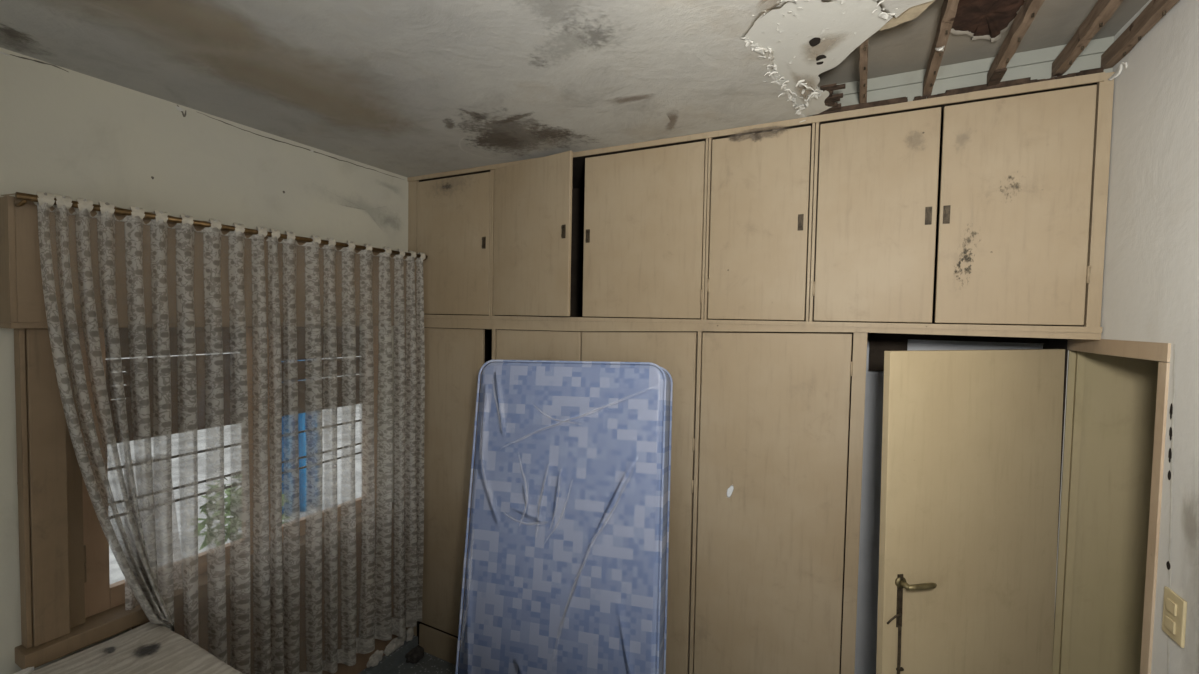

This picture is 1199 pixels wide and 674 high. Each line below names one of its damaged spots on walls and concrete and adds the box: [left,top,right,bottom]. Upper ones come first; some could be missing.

peeling [739,0,1127,122]
leakage [458,112,569,160]